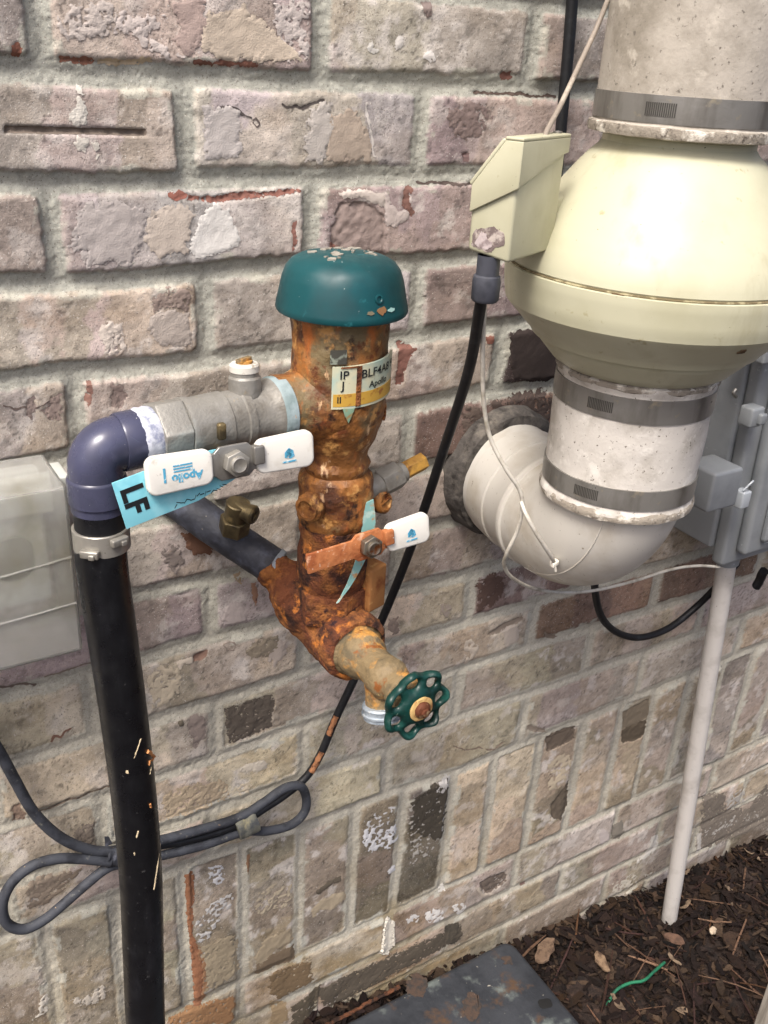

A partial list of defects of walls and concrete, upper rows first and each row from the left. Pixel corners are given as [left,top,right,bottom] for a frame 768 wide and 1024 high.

spalling [59,55,152,67]
spalling [193,59,258,68]
crack [282,99,325,110]
spalling [168,188,301,203]
spalling [330,185,415,255]
damp [362,774,450,864]
corrosion [167,871,236,1024]